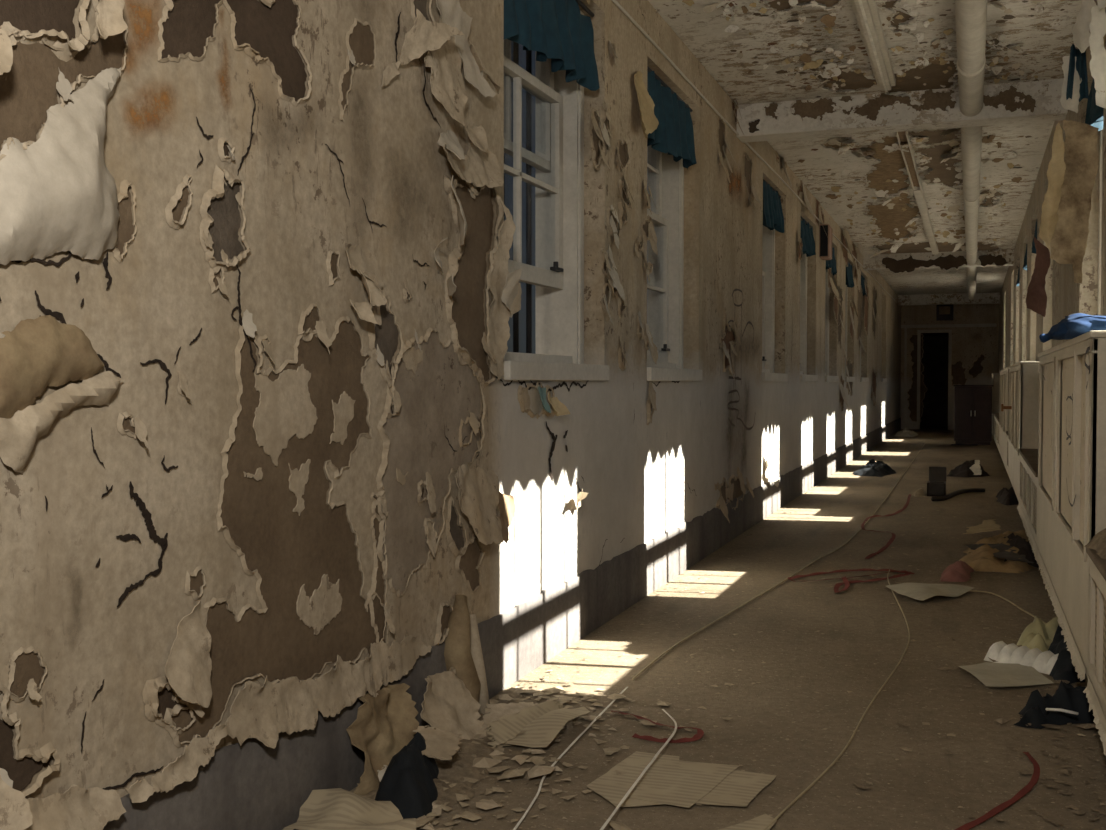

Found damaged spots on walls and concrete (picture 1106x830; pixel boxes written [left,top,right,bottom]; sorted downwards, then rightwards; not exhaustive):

peeling [634,71,659,139]
peeling [682,0,958,215]
peeling [775,127,1032,422]
peeling [0,0,522,830]
crack [496,376,587,392]
spalling [517,380,570,419]
crack [161,455,178,472]
crack [546,422,584,492]
crack [91,427,168,608]